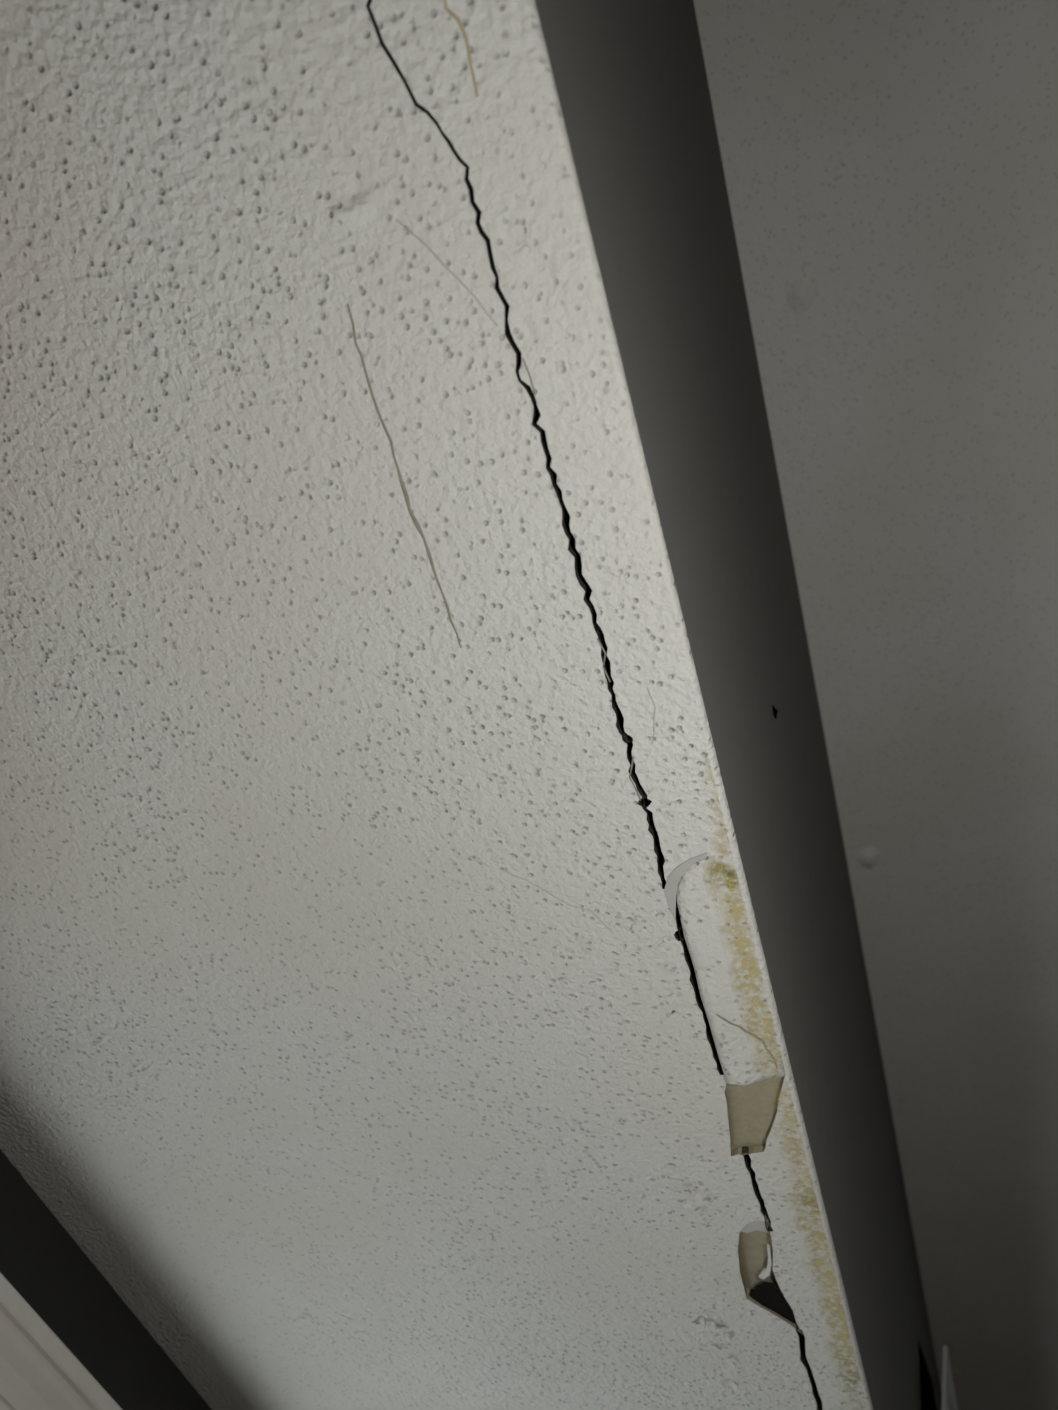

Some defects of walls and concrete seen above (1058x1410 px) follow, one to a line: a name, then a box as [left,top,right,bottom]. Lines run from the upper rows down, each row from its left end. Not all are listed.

crack [347,304,462,648]
crack [366,0,724,1075]
flaking render [725,1076,785,1156]
crack [743,1146,773,1231]
flaking render [738,1210,803,1335]
crack [796,1325,822,1410]